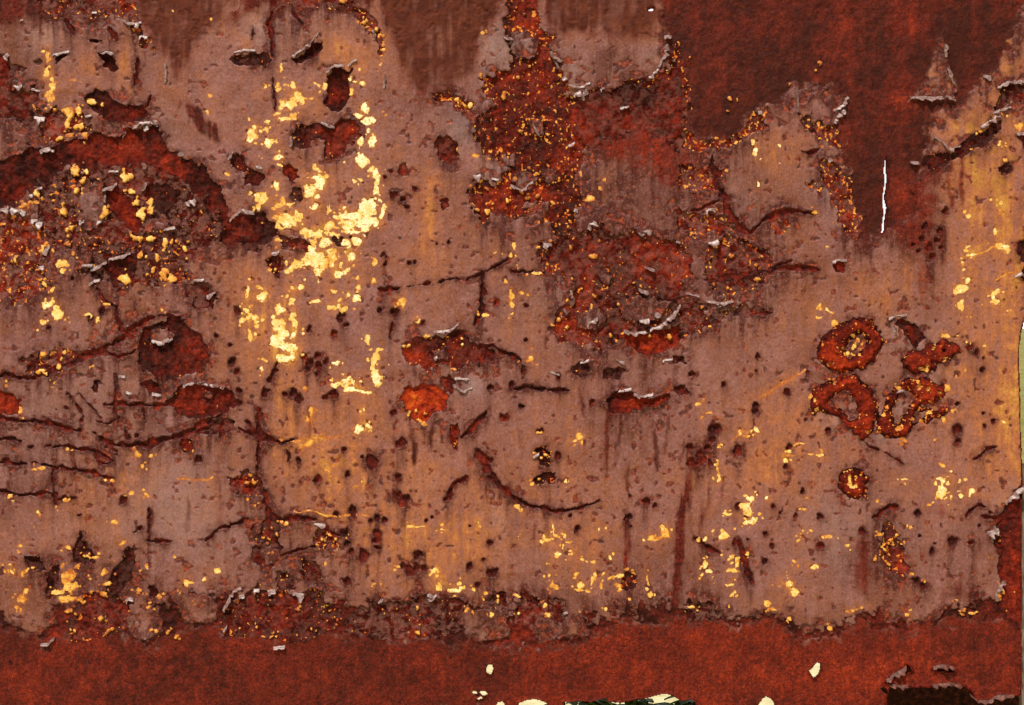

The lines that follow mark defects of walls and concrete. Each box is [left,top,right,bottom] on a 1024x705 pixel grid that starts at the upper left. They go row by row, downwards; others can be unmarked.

rust [0,0,104,35]
rust [178,98,226,148]
peeling [910,80,1024,175]
peeling [0,30,417,423]
peeling [432,0,773,488]
peeling [89,308,242,463]
crack [0,287,341,557]
peeling [390,316,497,426]
crack [378,258,570,394]
crack [443,410,600,514]
rust [810,317,961,440]
rust [0,407,1020,705]